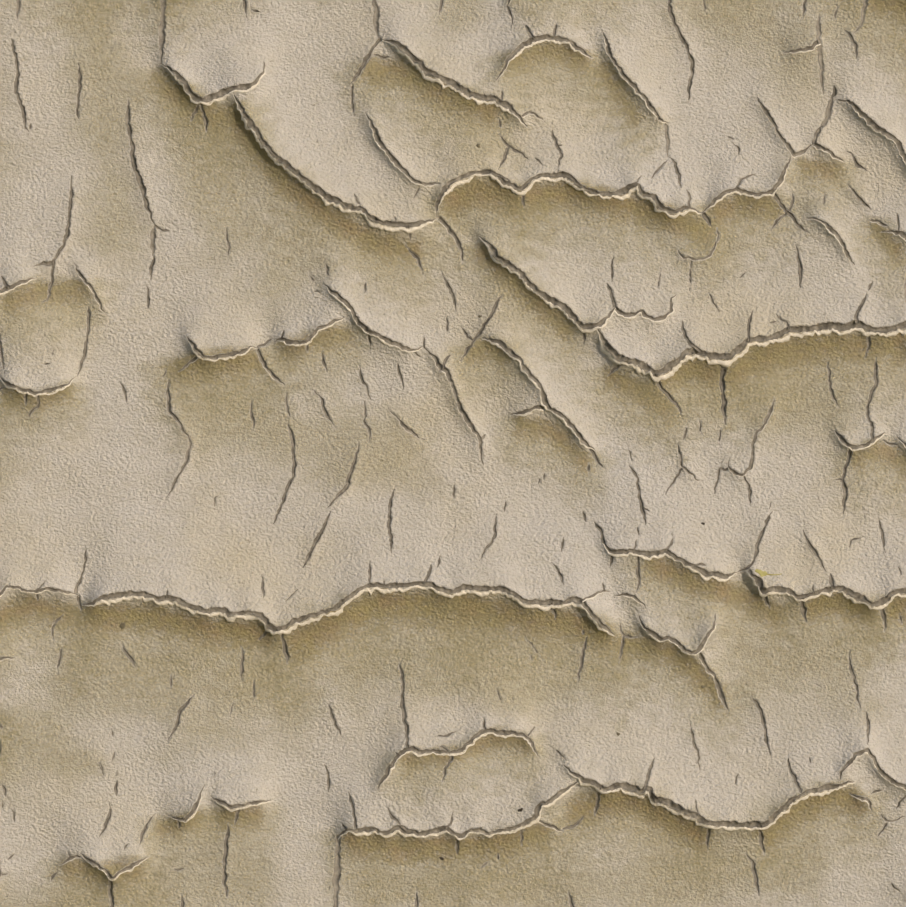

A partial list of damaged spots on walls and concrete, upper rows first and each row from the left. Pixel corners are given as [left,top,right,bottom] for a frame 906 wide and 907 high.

crack [0,0,906,714]
crack [168,675,195,740]
crack [2,784,15,822]
crack [99,728,117,837]
crack [51,785,272,907]
crack [325,651,906,907]